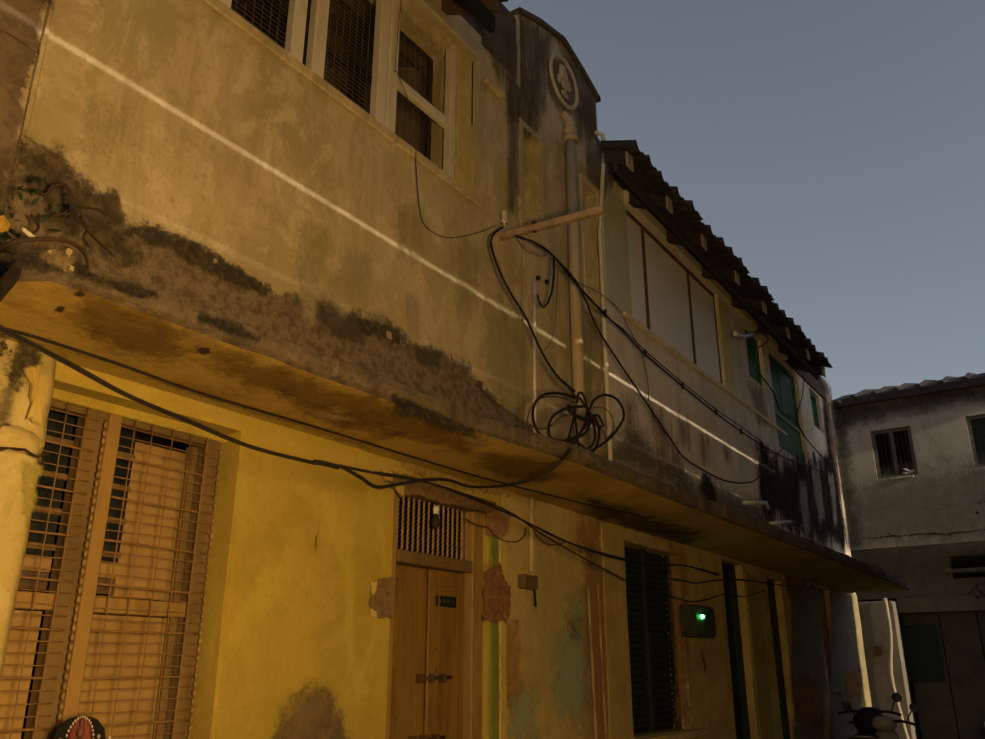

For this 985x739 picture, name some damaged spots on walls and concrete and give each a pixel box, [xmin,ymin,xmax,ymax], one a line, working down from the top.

water stain [0,141,533,432]
water stain [213,352,470,453]
flaking render [369,577,396,619]
spalling [483,563,521,705]
water stain [605,379,985,553]
crack [859,529,985,539]